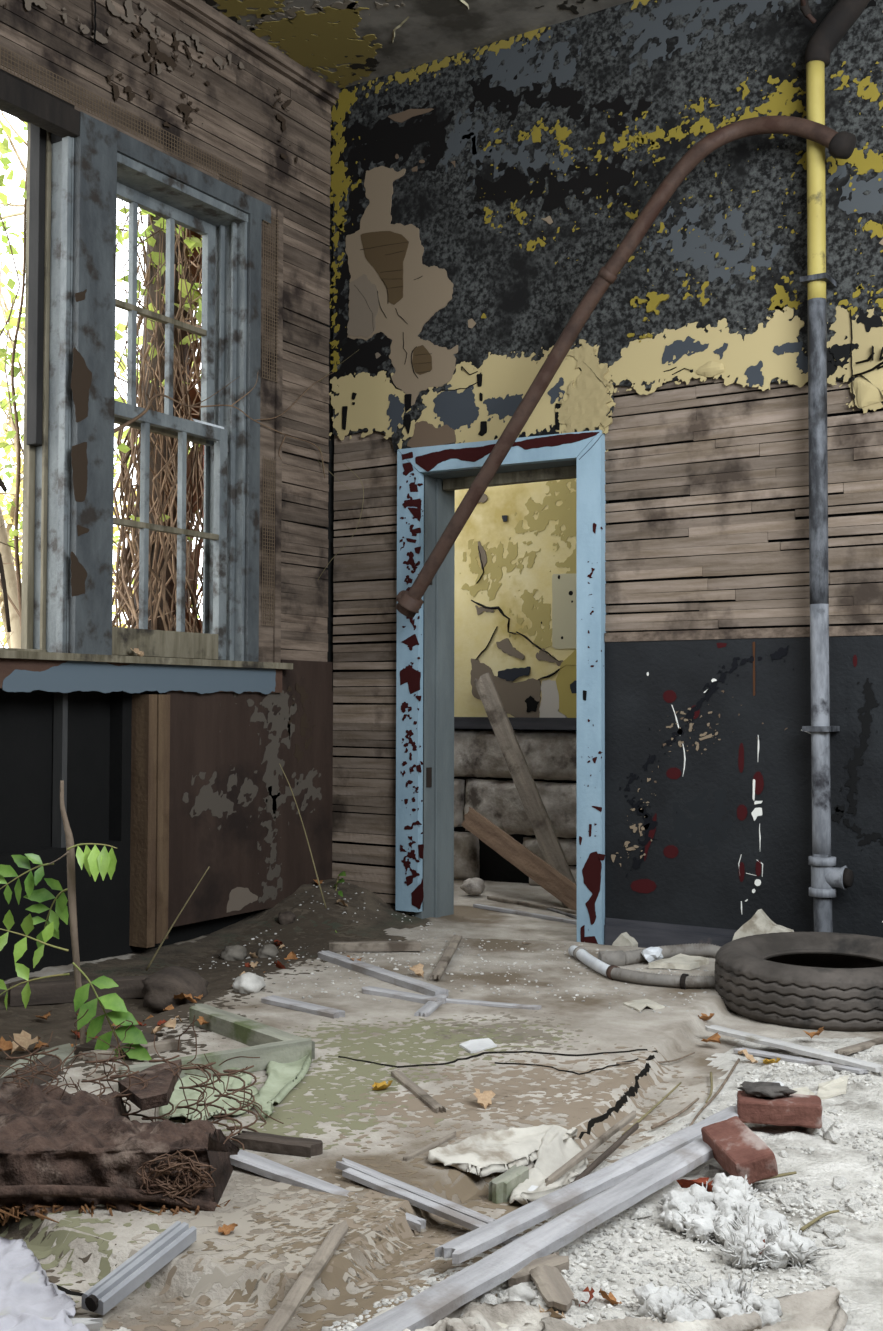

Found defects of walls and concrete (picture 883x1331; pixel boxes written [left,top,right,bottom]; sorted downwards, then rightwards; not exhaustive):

peeling [830,61,883,114]
peeling [826,146,883,191]
peeling [854,209,883,254]
spalling [214,0,808,569]
peeling [827,284,883,414]
peeling [402,619,419,647]
peeling [400,666,421,708]
spalling [470,638,577,718]
peeling [579,646,794,944]
peeling [406,875,424,909]